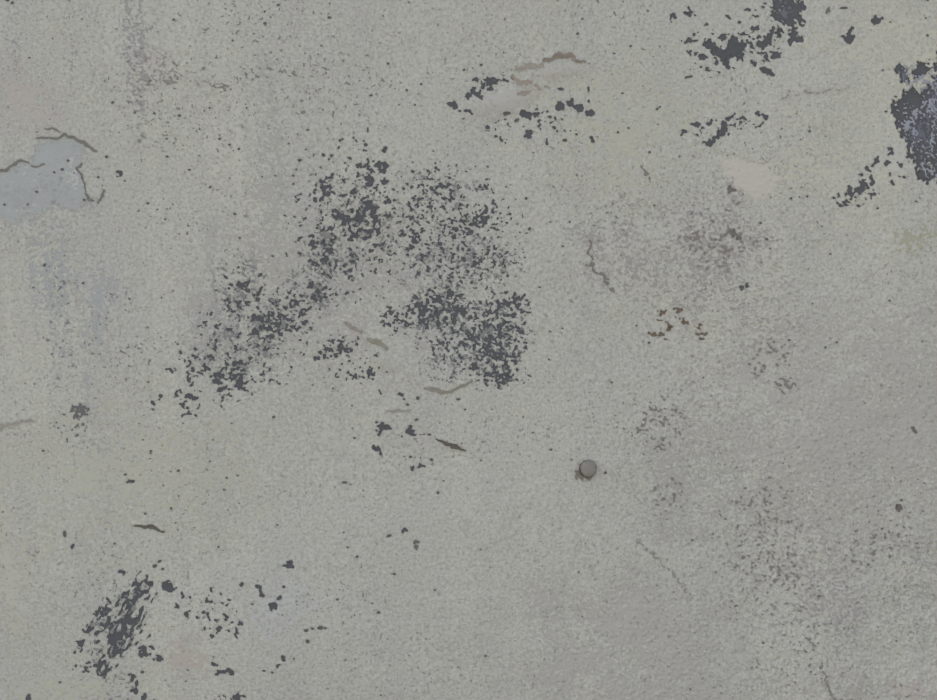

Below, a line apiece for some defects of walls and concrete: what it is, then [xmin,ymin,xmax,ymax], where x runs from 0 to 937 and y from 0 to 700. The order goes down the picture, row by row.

spalling [676,0,806,81]
peeling [447,72,513,115]
peeling [519,86,595,145]
peeling [680,111,769,147]
spalling [832,51,937,210]
peeling [165,127,537,417]
peeling [72,570,243,700]
peeling [255,581,282,610]